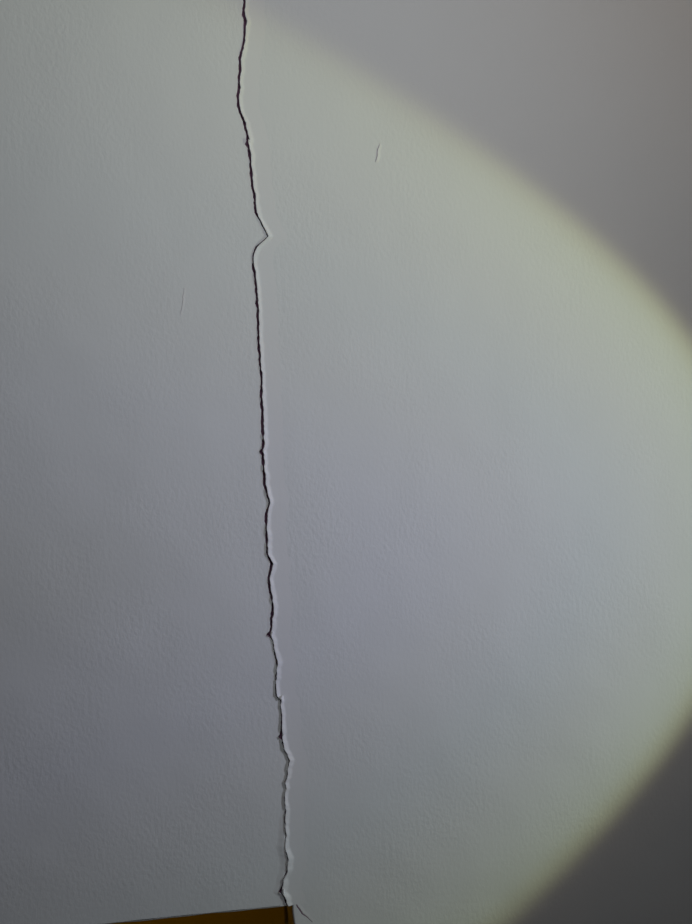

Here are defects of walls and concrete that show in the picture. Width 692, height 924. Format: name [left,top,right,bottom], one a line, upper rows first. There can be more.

crack [233,0,314,922]